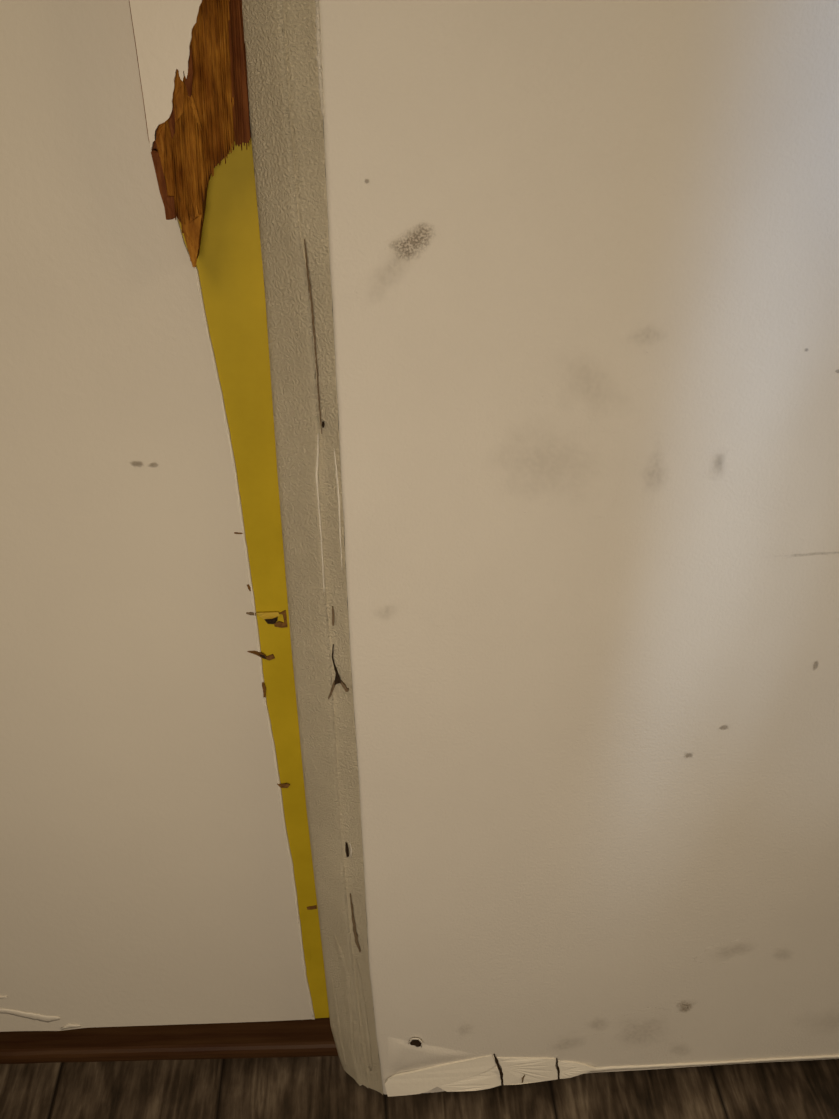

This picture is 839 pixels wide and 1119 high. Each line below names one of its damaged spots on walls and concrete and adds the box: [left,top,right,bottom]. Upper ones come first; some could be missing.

crack [304,239,349,699]
peeling [385,1054,596,1097]